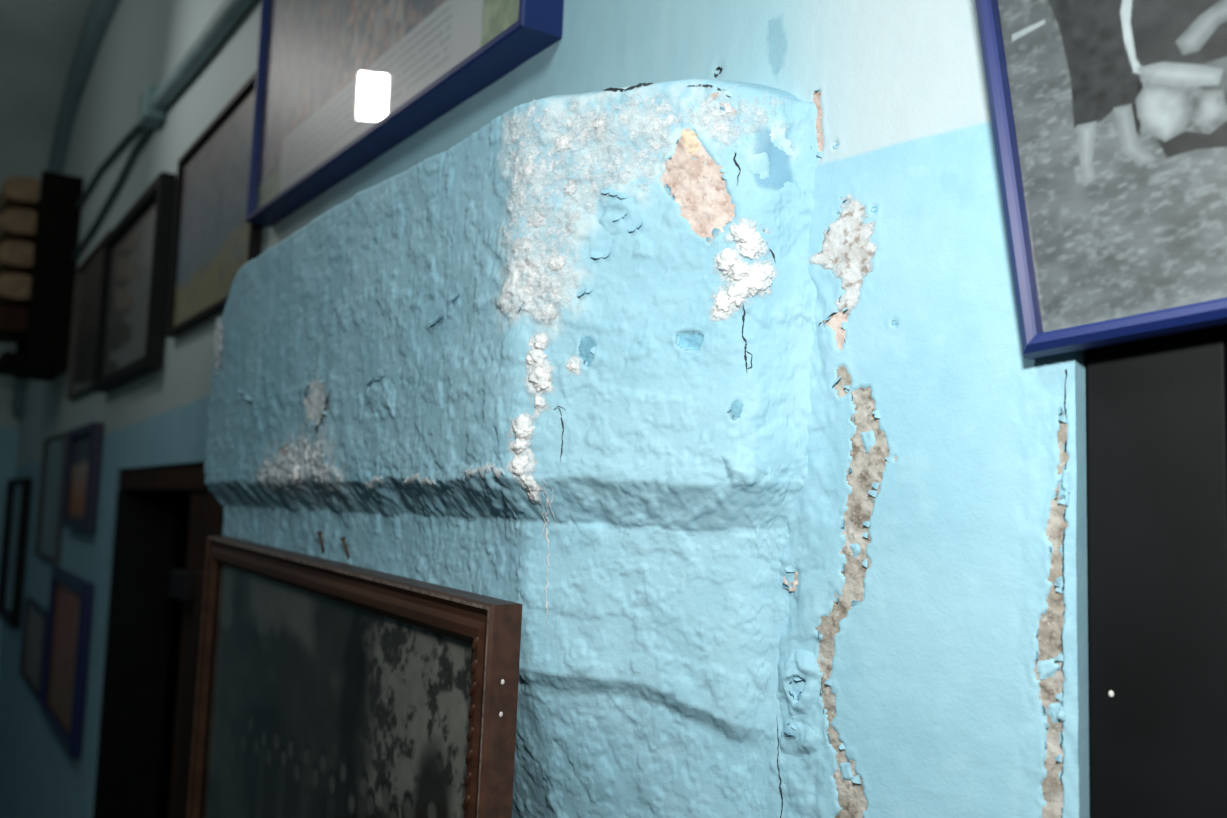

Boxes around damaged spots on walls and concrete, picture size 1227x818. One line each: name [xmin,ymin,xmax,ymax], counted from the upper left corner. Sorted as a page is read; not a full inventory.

peeling [660,127,738,244]
peeling [303,368,329,435]
leakage [462,87,783,625]
crack [742,304,752,371]
peeling [809,193,877,350]
peeling [815,365,897,818]
peeling [1033,406,1070,818]